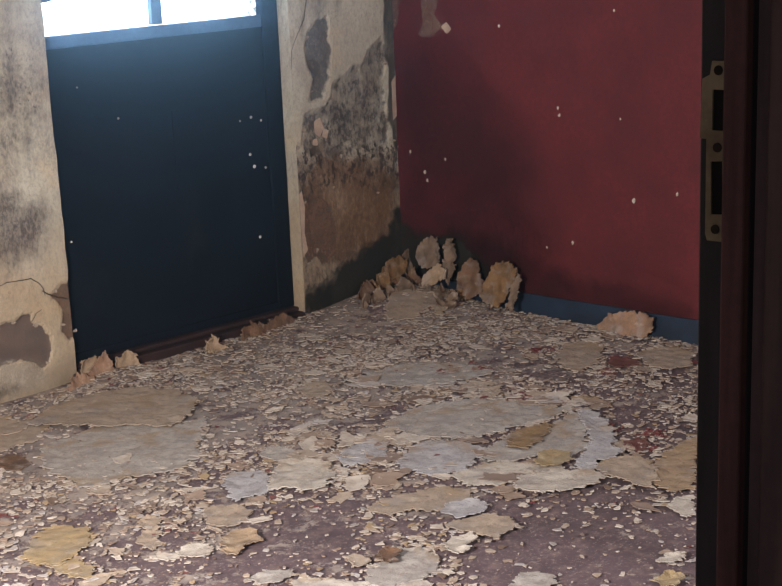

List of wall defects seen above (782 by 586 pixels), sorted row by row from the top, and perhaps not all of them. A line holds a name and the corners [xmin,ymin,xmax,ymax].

leakage [0,195,39,260]
peeling [299,191,319,264]
leakage [296,139,491,313]
spalling [0,314,51,368]
crack [0,278,69,322]
spalling [51,284,77,339]